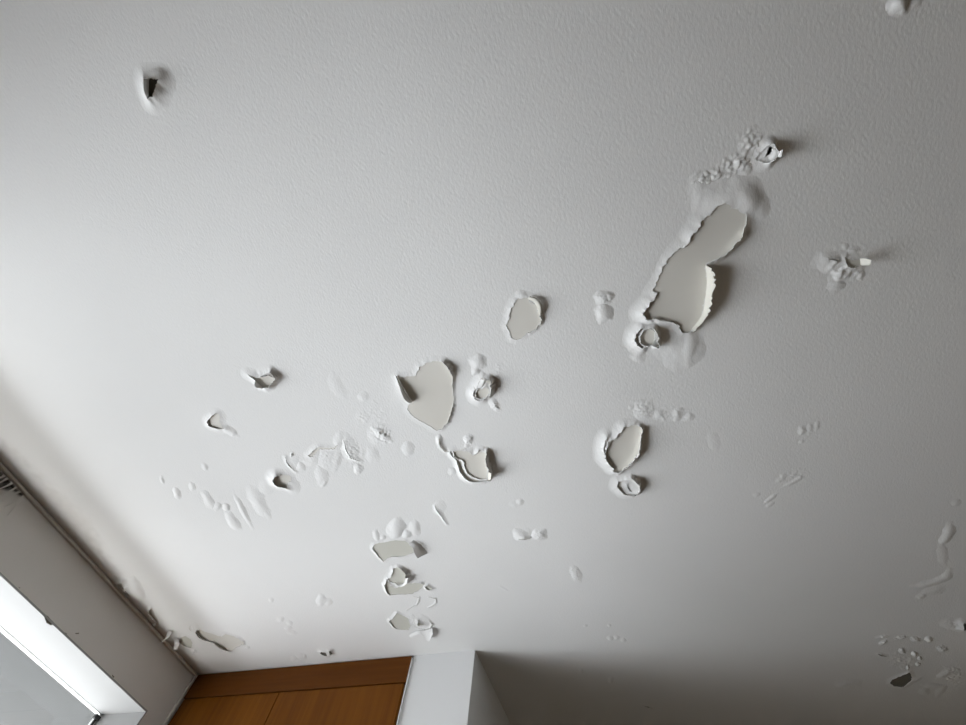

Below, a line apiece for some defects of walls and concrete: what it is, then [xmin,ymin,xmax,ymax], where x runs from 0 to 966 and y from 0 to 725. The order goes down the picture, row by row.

peeling [133,62,176,116]
peeling [622,133,785,372]
peeling [500,289,546,345]
peeling [240,364,283,393]
peeling [201,407,240,438]
peeling [390,355,501,486]
peeling [258,467,301,497]
peeling [592,418,646,499]
peeling [114,576,250,655]
peeling [369,537,438,641]
peeling [874,634,949,689]